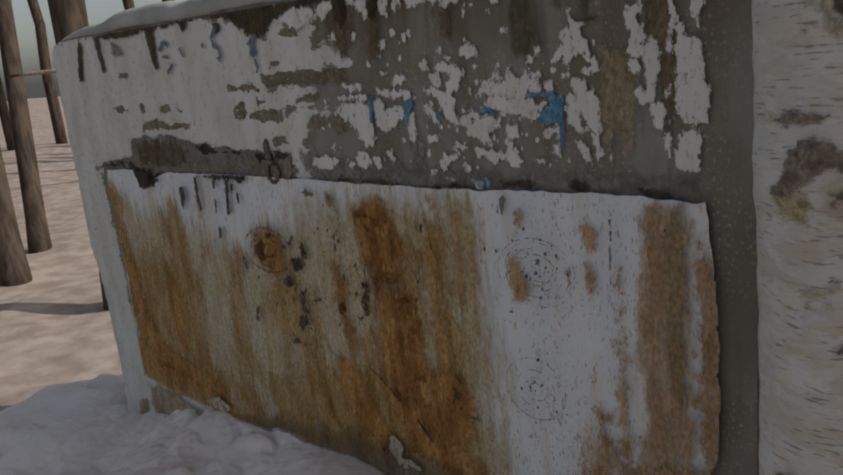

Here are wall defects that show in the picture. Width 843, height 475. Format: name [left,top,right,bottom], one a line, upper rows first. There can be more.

peeling [52,0,613,414]
rust [109,179,566,475]
rust [543,201,721,475]
peeling [623,0,712,173]